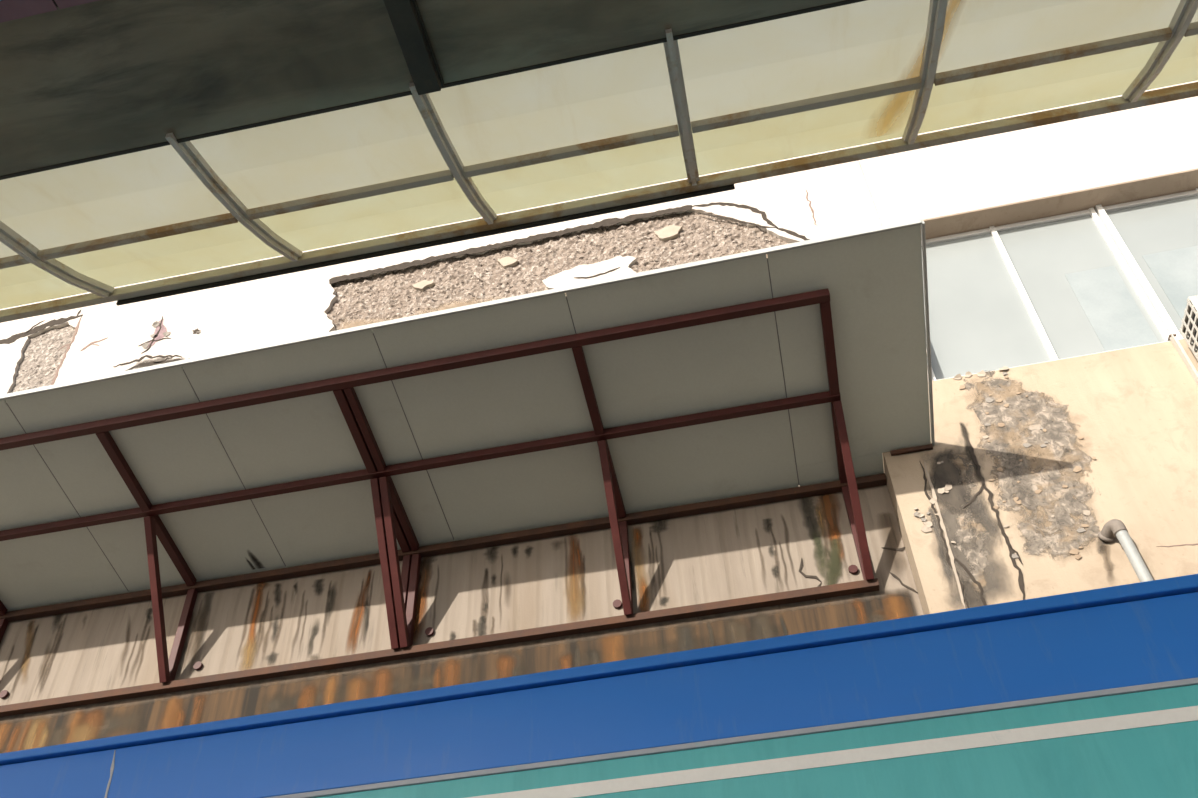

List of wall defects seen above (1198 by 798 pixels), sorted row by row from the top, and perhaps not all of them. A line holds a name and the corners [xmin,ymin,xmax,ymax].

rust [941,0,961,44]
rust [878,46,925,134]
spalling [327,202,811,330]
spalling [11,325,75,393]
peeling [953,366,1100,560]
rust [818,493,843,558]
rust [413,557,439,640]
rust [566,535,584,612]
rust [630,529,660,612]
rust [0,571,916,753]